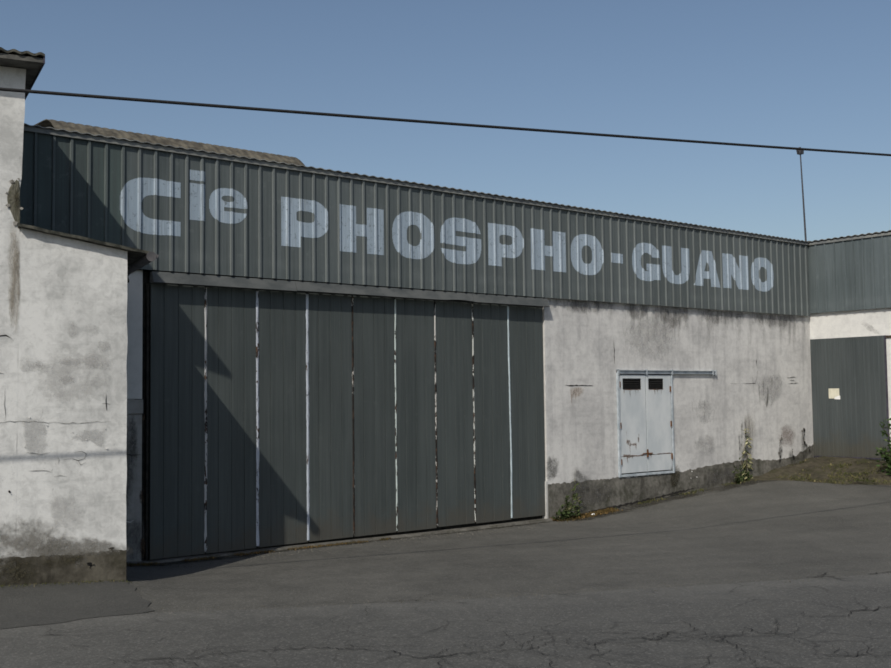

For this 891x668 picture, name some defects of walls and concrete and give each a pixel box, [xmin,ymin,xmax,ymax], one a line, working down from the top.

crack [0,400,111,424]
damp [126,440,134,498]